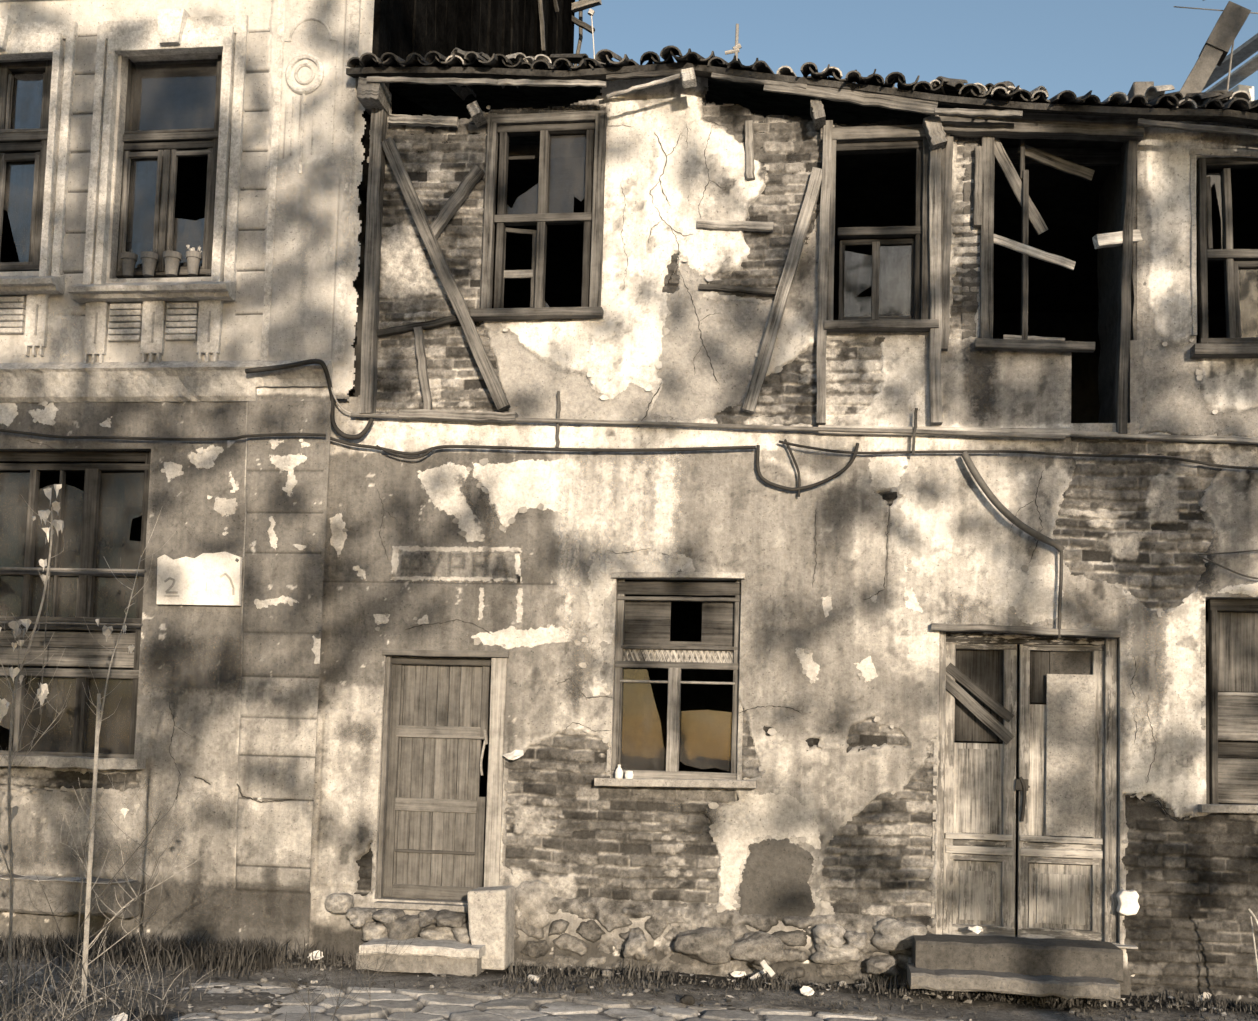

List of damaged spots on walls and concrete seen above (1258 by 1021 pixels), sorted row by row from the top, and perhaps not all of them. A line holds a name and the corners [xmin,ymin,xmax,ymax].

flaking render [376,86,885,427]